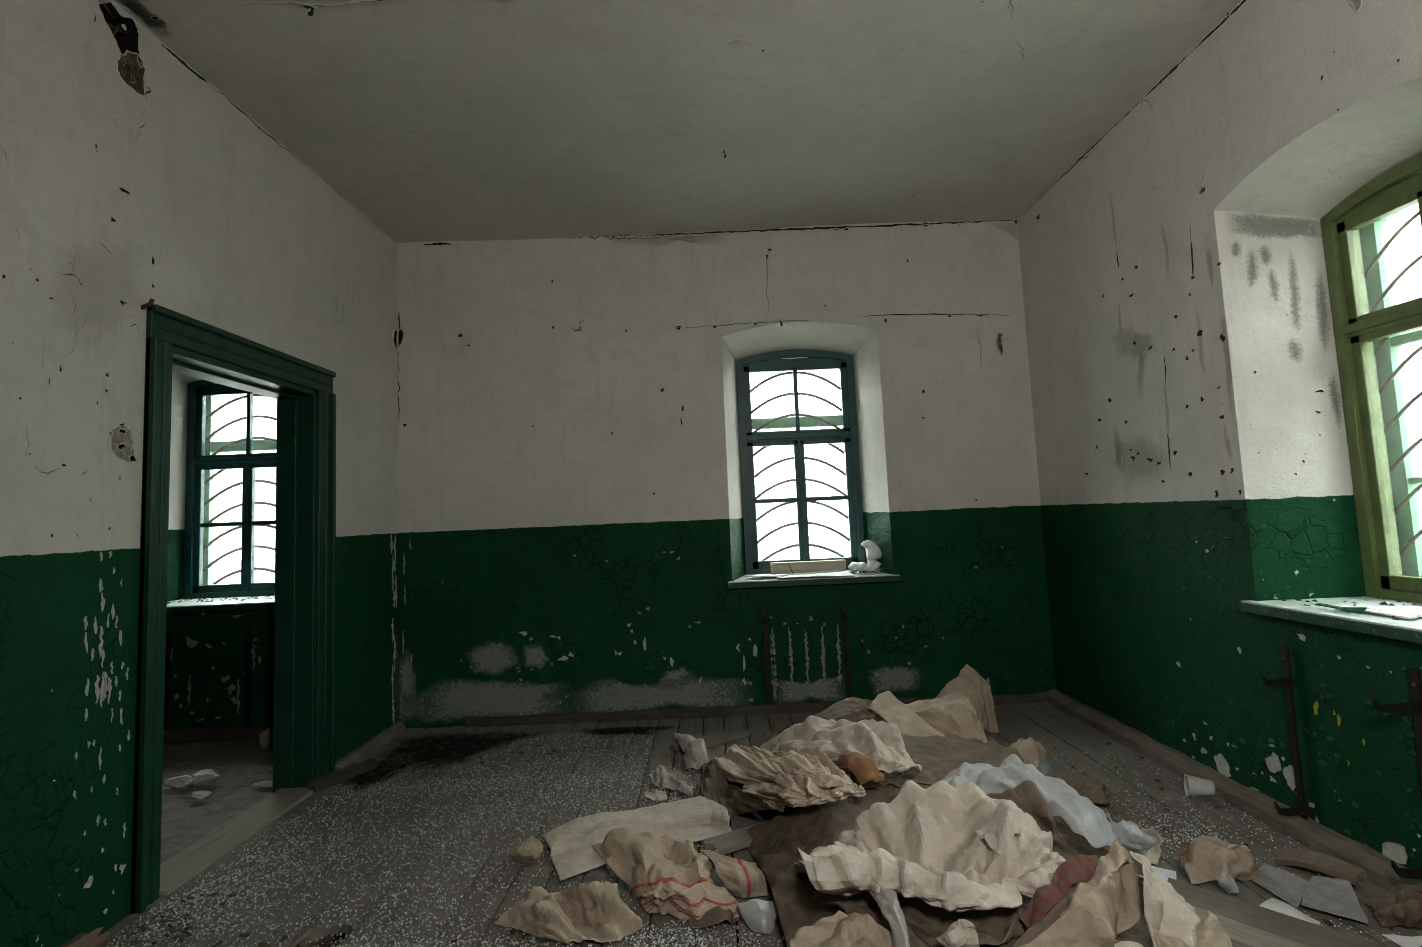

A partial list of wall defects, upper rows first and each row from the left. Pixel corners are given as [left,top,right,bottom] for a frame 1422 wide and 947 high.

flaking render [93,2,152,139]
leakage [1233,215,1314,326]
leakage [1317,284,1328,344]
leakage [1314,381,1340,418]
flaking render [107,422,137,481]
peeling [73,551,130,799]
peeling [390,534,575,724]
peeling [585,615,843,712]
peeling [1182,720,1321,824]
peeling [82,815,126,838]
peeling [73,866,94,890]
peeling [100,846,127,916]